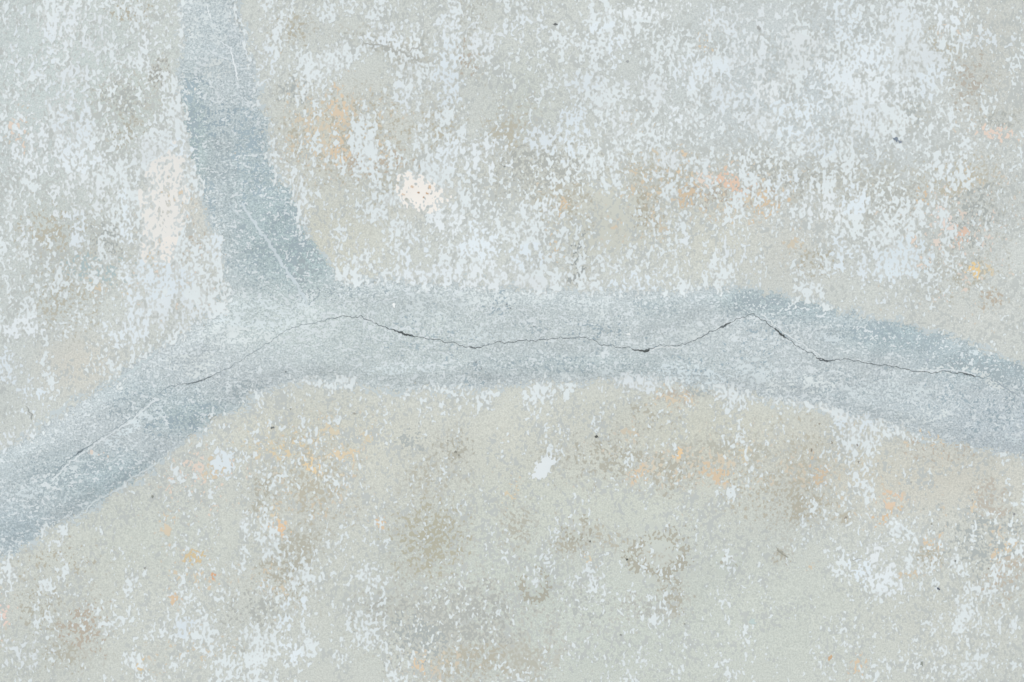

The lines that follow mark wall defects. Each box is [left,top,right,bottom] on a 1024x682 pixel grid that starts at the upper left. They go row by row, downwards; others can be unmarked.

crack [52,290,1019,481]